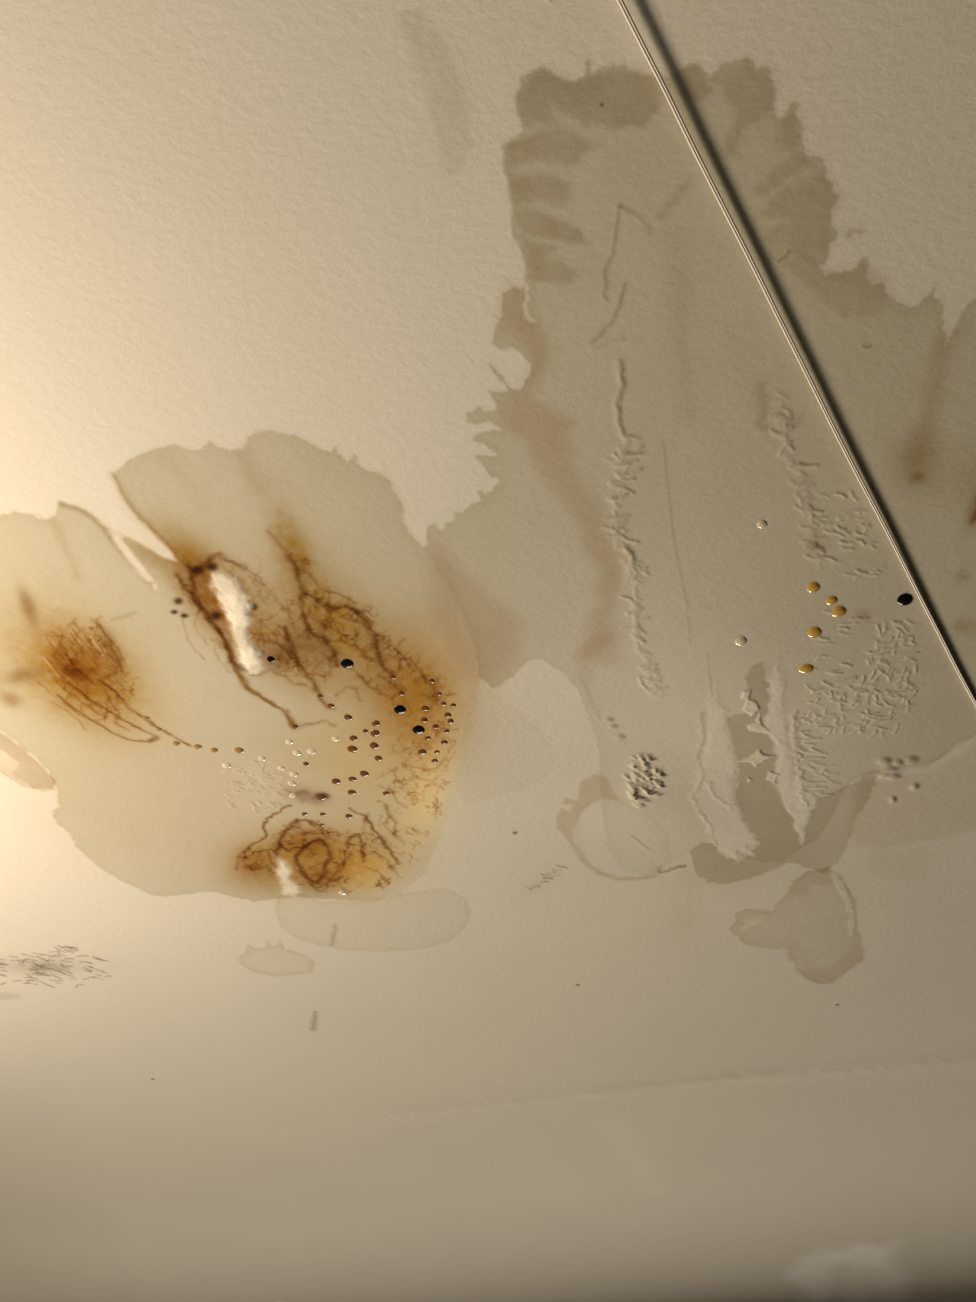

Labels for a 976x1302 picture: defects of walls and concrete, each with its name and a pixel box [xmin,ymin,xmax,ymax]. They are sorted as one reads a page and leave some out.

leakage [389,6,481,186]
leakage [463,52,976,478]
rust [869,400,976,543]
leakage [0,426,473,978]
peeling [206,566,269,676]
rust [0,476,532,919]
leakage [650,859,867,986]